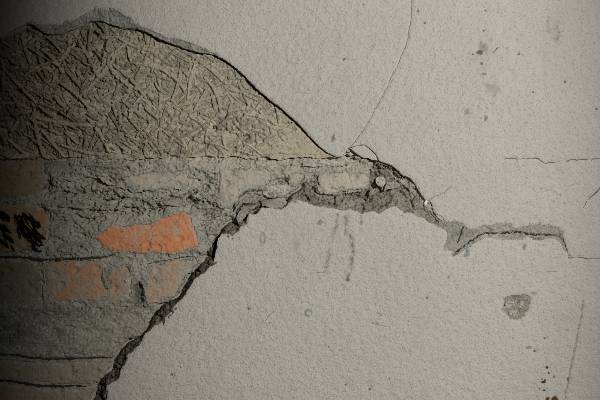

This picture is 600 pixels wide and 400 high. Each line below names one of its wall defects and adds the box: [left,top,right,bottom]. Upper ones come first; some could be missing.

crack [350,4,412,153]
crack [505,156,600,164]
spalling [0,6,441,400]
spalling [439,220,566,257]
peeling [501,293,531,320]